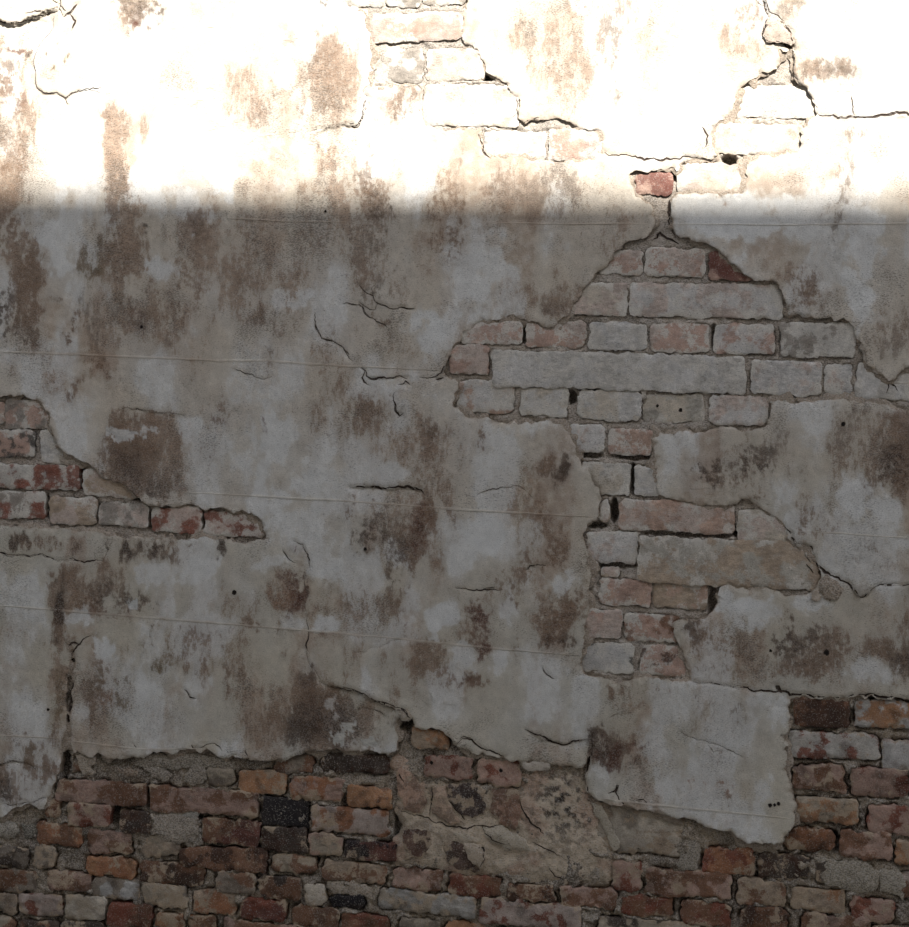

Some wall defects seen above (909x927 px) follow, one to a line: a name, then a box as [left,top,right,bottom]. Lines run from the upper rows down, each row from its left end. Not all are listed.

crack [0,0,101,104]
spalling [340,0,616,162]
spalling [0,395,270,543]
water stain [0,0,649,812]
crack [346,285,414,327]
crack [314,314,447,417]
spalling [445,1,909,683]
water stain [585,398,909,752]
crack [305,619,409,717]
spalling [0,652,909,927]